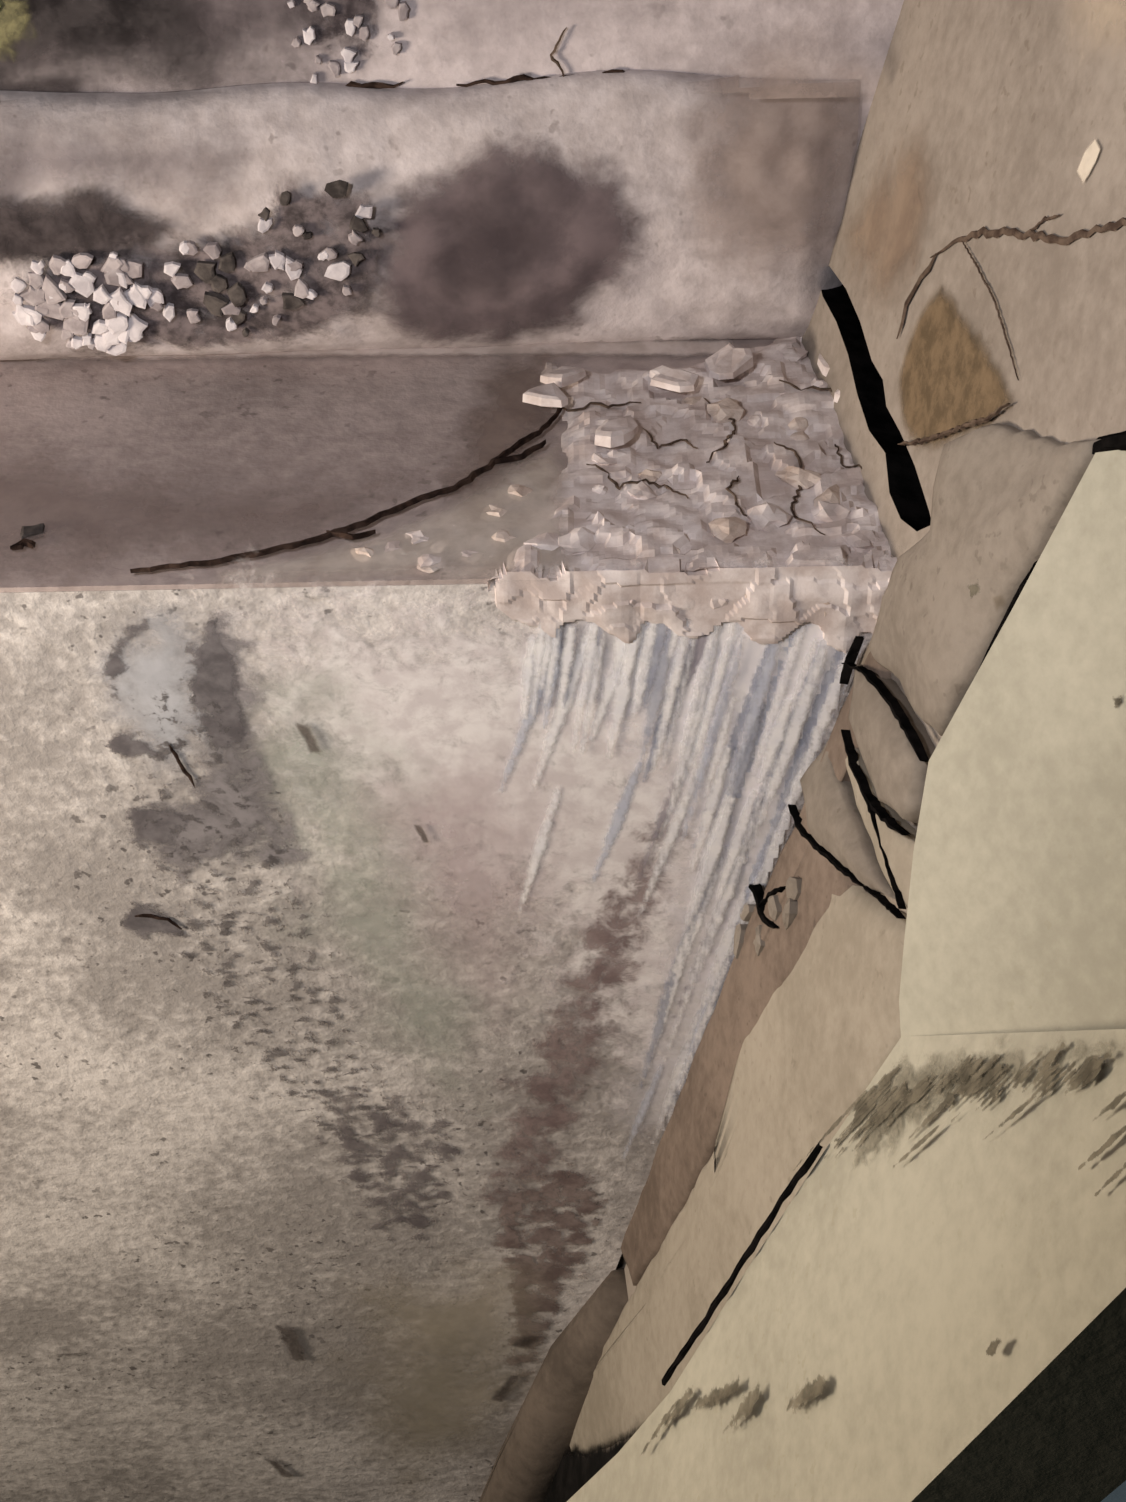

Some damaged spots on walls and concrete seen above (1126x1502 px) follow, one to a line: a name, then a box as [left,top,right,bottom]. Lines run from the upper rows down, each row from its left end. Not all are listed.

leakage [0,0,375,93]
peeling [287,0,369,84]
peeling [384,0,410,55]
peeling [11,180,391,356]
leakage [52,146,729,570]
crack [821,215,1126,531]
crack [130,407,563,573]
crack [839,636,929,762]
crack [788,729,911,919]
leakage [104,589,873,1248]
rust [485,860,663,1381]